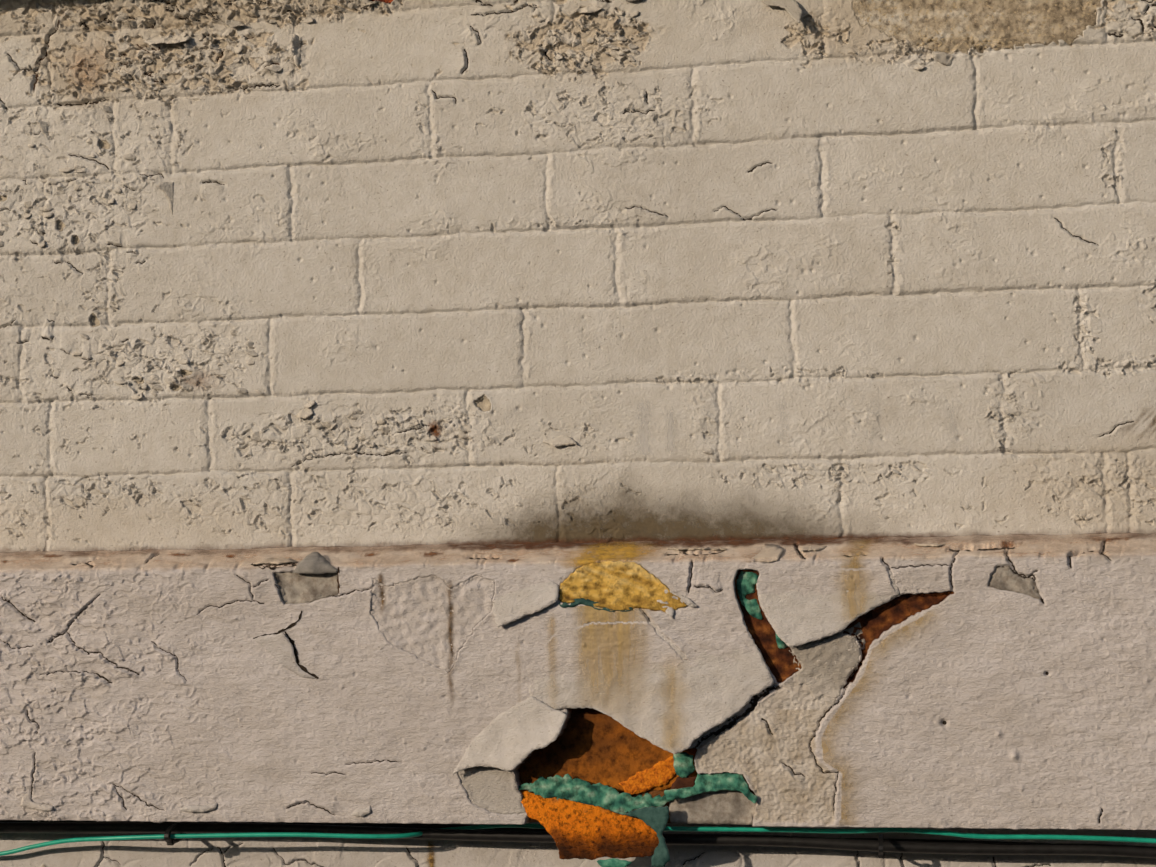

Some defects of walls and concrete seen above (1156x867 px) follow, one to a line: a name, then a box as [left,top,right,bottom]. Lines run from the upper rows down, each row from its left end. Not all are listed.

crack [1108,0,1156,37]
peeling [113,57,167,100]
peeling [136,33,244,64]
peeling [254,34,301,72]
crack [1,559,139,683]
crack [196,575,280,615]
peeling [251,552,340,679]
rust [582,606,634,682]
peeling [371,544,954,867]
crack [27,710,40,796]
crack [113,784,165,811]
crack [286,760,397,815]